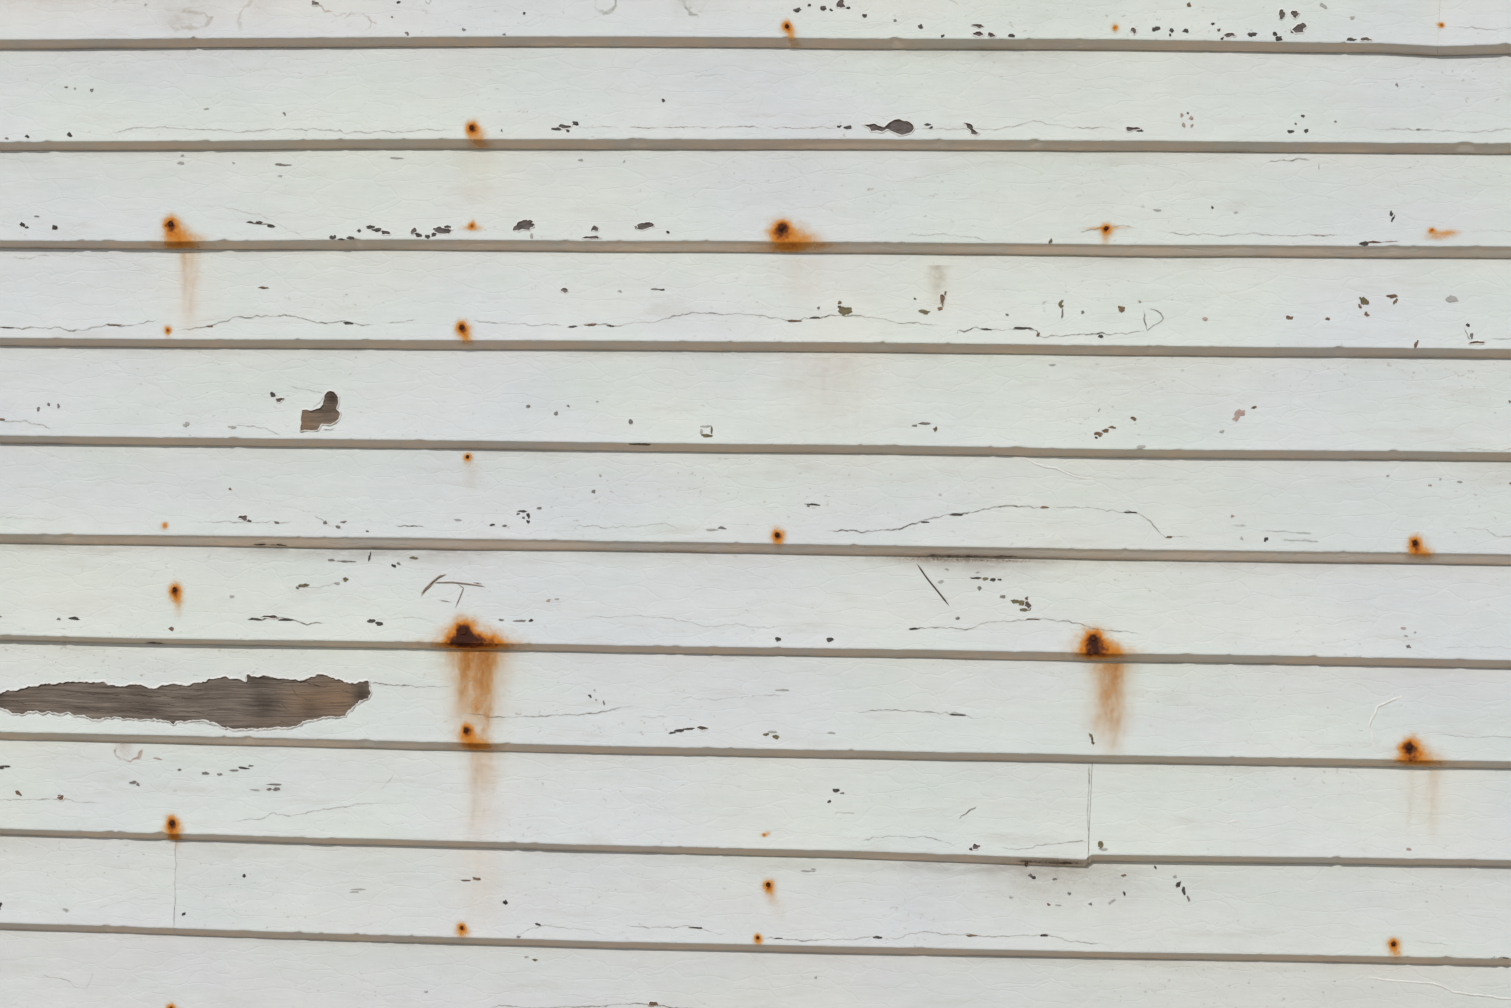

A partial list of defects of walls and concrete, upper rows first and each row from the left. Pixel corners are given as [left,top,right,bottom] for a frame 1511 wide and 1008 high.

corrosion [162,216,197,249]
corrosion [768,219,826,252]
peeling [299,390,342,433]
peeling [0,672,373,732]
corrosion [434,618,512,750]
corrosion [1076,628,1124,699]
corrosion [1396,737,1440,766]